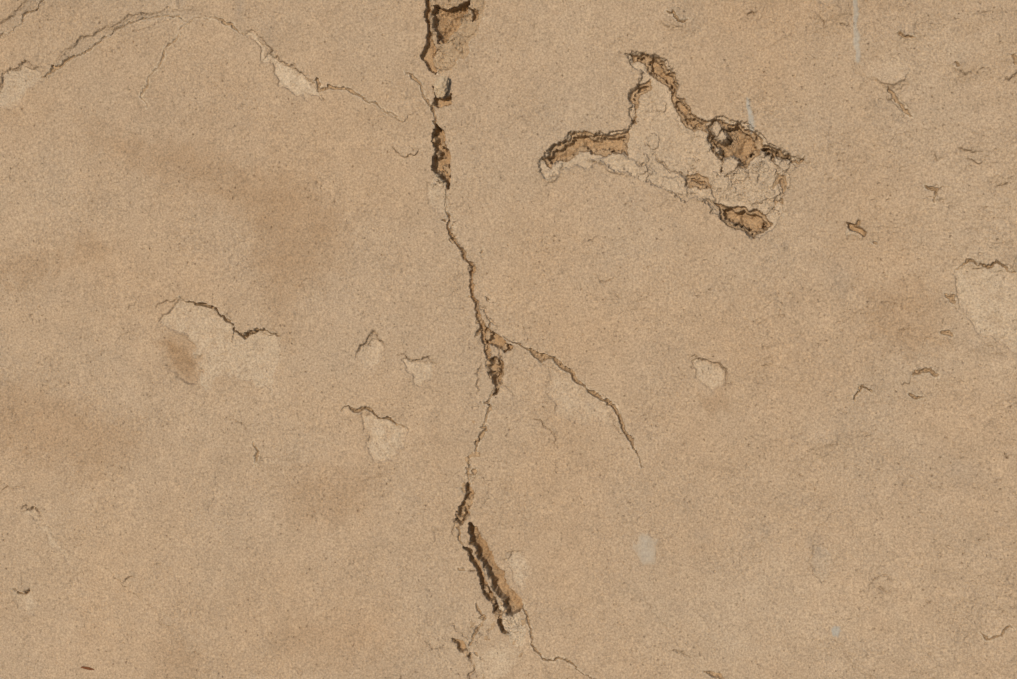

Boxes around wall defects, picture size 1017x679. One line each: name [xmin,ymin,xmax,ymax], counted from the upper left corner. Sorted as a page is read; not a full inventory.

crack [0,0,44,39]
flaking render [0,60,60,112]
crack [46,0,247,108]
spalling [537,51,810,240]
flaking render [149,297,283,397]
crack [316,0,642,679]
crack [641,589,724,679]
crack [980,625,1015,641]